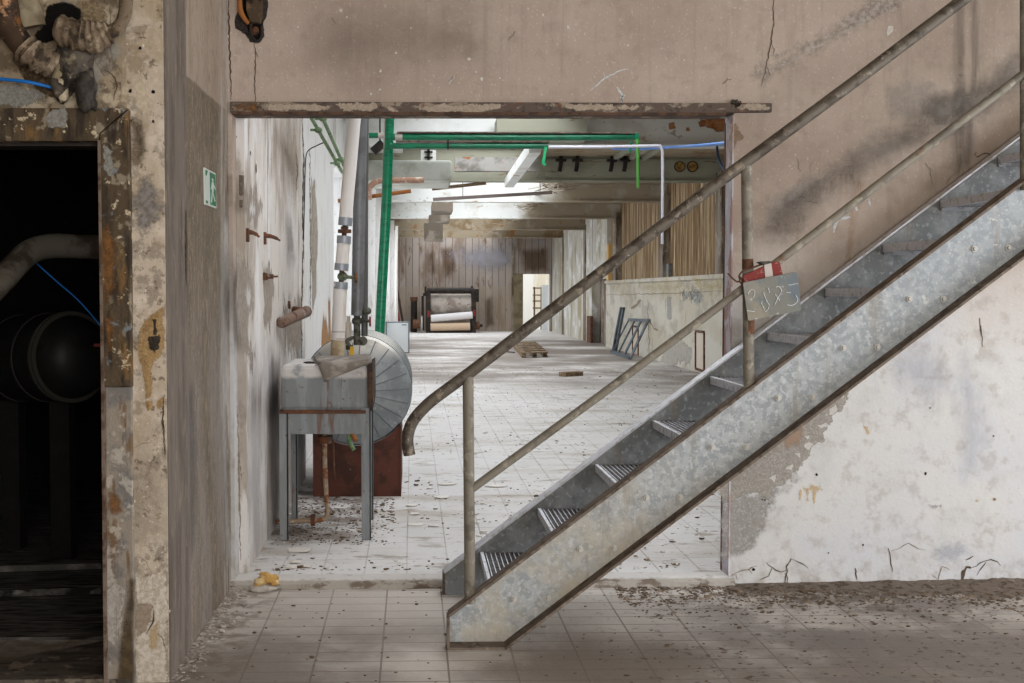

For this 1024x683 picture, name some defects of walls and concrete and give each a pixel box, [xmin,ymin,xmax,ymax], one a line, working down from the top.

crack [761,1,775,85]
leakage [285,135,297,181]
spalling [137,308,166,455]
peeling [719,392,849,558]
crack [731,559,808,582]
crack [888,543,1001,580]